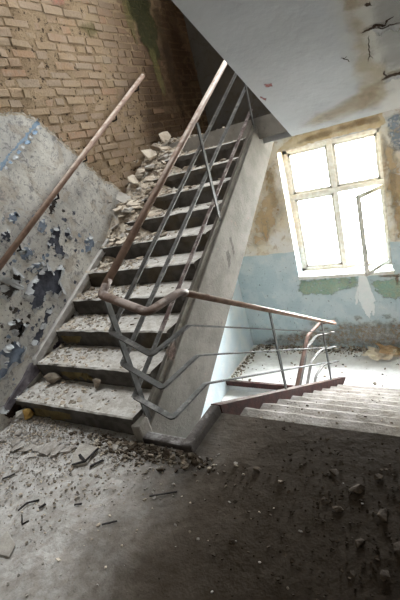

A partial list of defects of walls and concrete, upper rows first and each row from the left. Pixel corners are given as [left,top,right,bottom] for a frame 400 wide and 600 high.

crack [362,16,400,61]
crack [381,71,400,82]
peeling [0,119,42,171]
damp [254,171,279,244]
peeling [0,198,95,418]
peeling [299,277,358,295]
peeling [373,279,400,299]